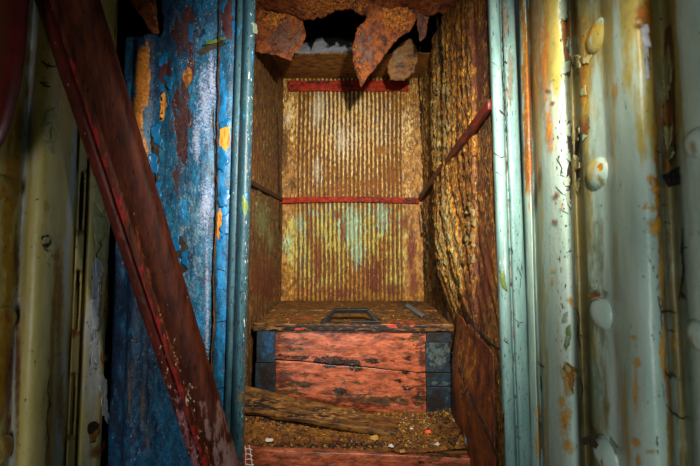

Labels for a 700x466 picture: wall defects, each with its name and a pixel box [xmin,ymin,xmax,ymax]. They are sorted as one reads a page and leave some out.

peeling [148,53,173,199]
peeling [216,118,230,172]
rust [524,56,540,205]
rust [540,16,554,149]
peeling [559,0,592,209]
peeling [217,187,231,240]
rust [402,214,418,293]
rust [559,377,573,454]